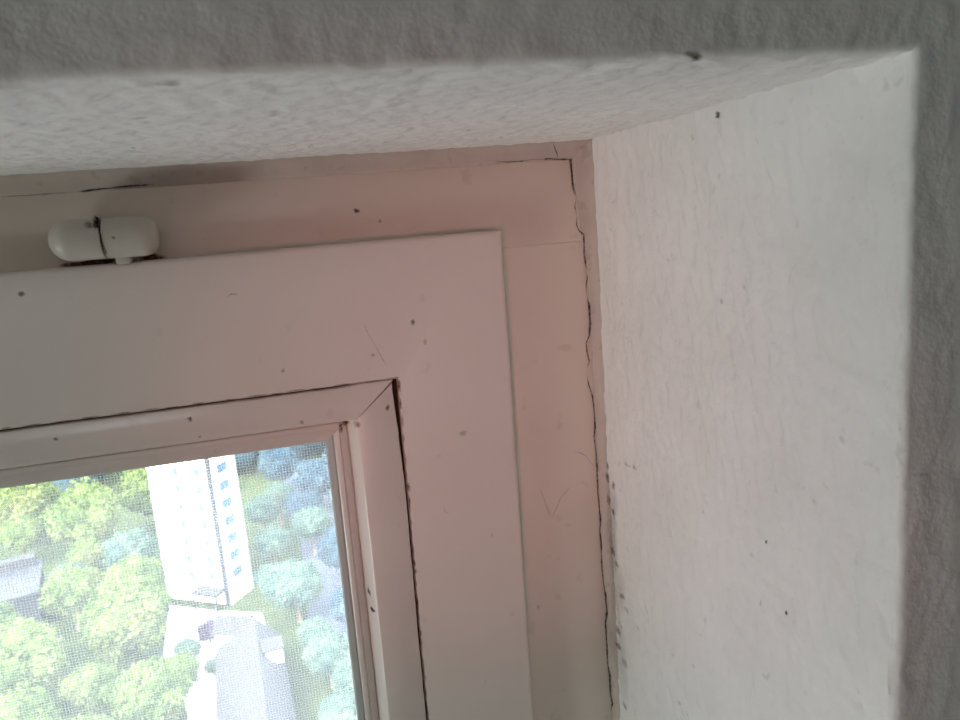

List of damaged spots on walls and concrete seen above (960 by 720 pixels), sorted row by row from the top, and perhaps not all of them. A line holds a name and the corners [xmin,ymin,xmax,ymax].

crack [503,146,613,707]